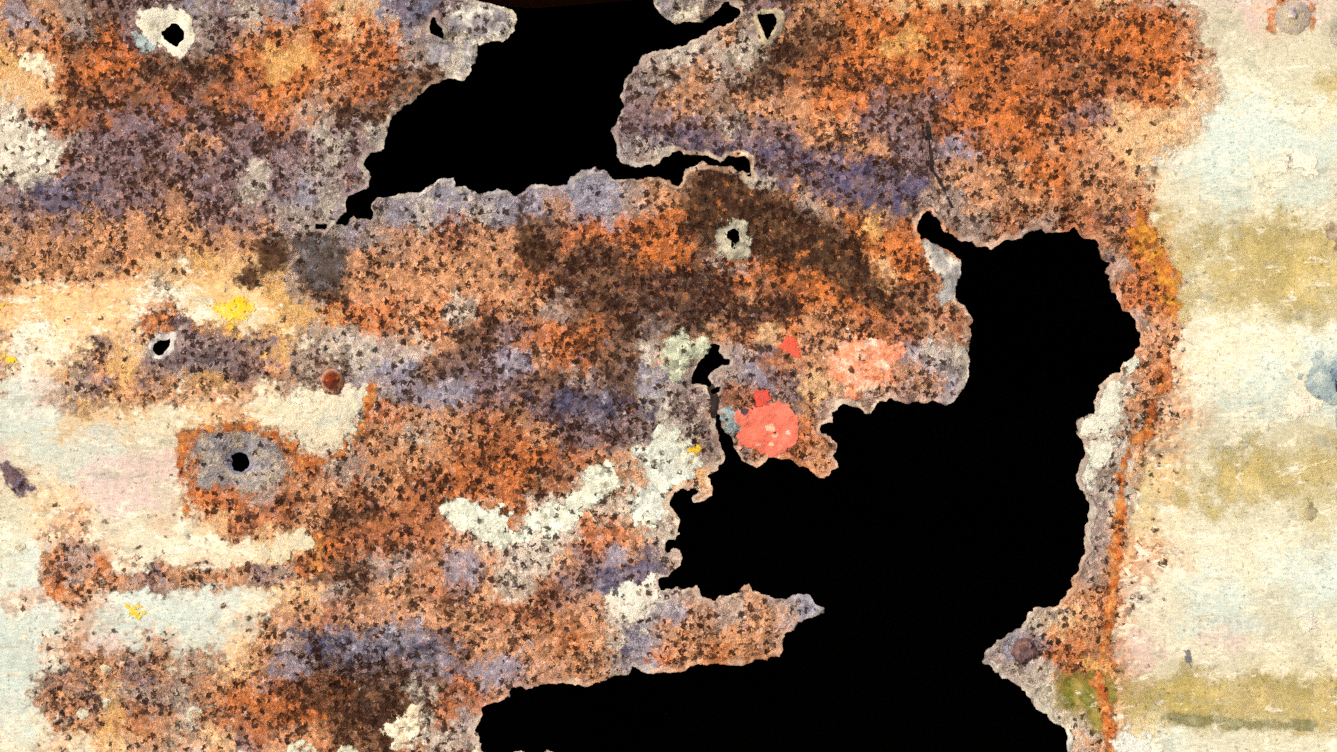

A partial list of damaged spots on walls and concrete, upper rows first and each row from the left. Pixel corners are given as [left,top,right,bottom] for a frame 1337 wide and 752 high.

peeling [131,4,195,59]
peeling [146,308,238,378]
rust [0,460,37,497]
rust [175,441,188,478]
rust [175,424,240,443]
rust [219,422,257,432]
peeling [189,382,369,498]
rust [258,428,308,467]
peeling [437,424,703,551]
peeling [1076,354,1140,492]
rust [37,537,114,610]
peeling [604,572,658,627]